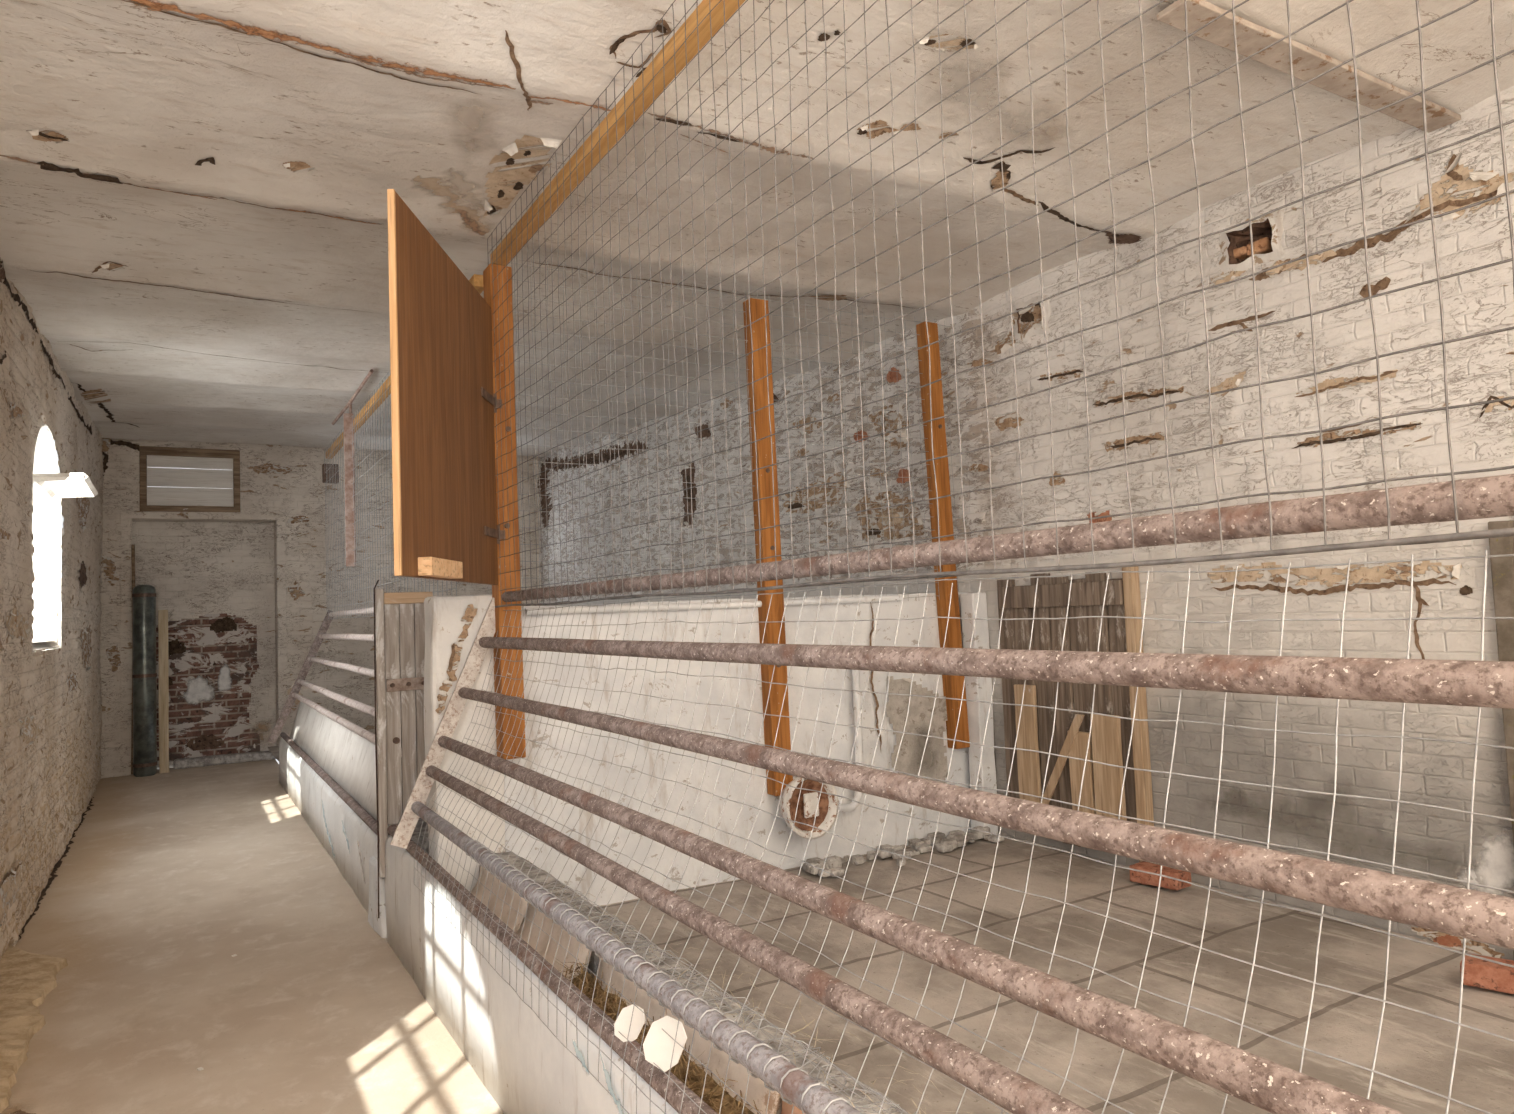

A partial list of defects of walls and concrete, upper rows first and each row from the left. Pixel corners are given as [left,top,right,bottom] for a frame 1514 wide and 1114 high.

crack [505,30,532,110]
peeling [482,135,562,218]
crack [964,147,1141,244]
peeling [1405,151,1514,223]
spalling [1210,210,1286,285]
crack [0,260,387,476]
spalling [537,440,648,527]
peeling [1207,561,1473,596]
flaking render [156,613,260,762]